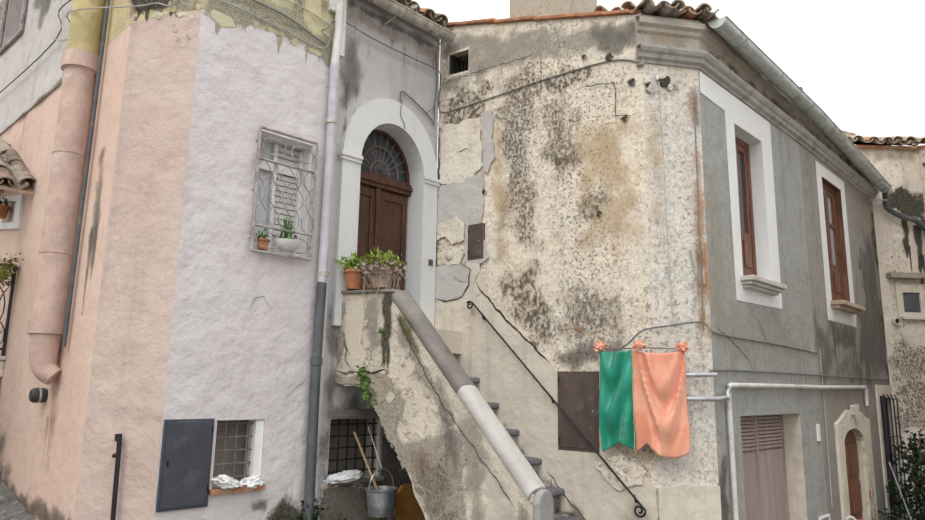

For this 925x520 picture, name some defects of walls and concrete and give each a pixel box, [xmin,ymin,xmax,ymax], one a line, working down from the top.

water stain [35,0,50,26]
water stain [130,0,197,21]
spalling [444,54,591,251]
water stain [83,183,101,300]
water stain [365,288,394,369]
spalling [500,259,623,347]
spalling [580,190,607,220]
corrosion [695,151,711,349]
water stain [815,214,889,383]
water stain [888,186,925,284]
spalling [319,297,469,520]